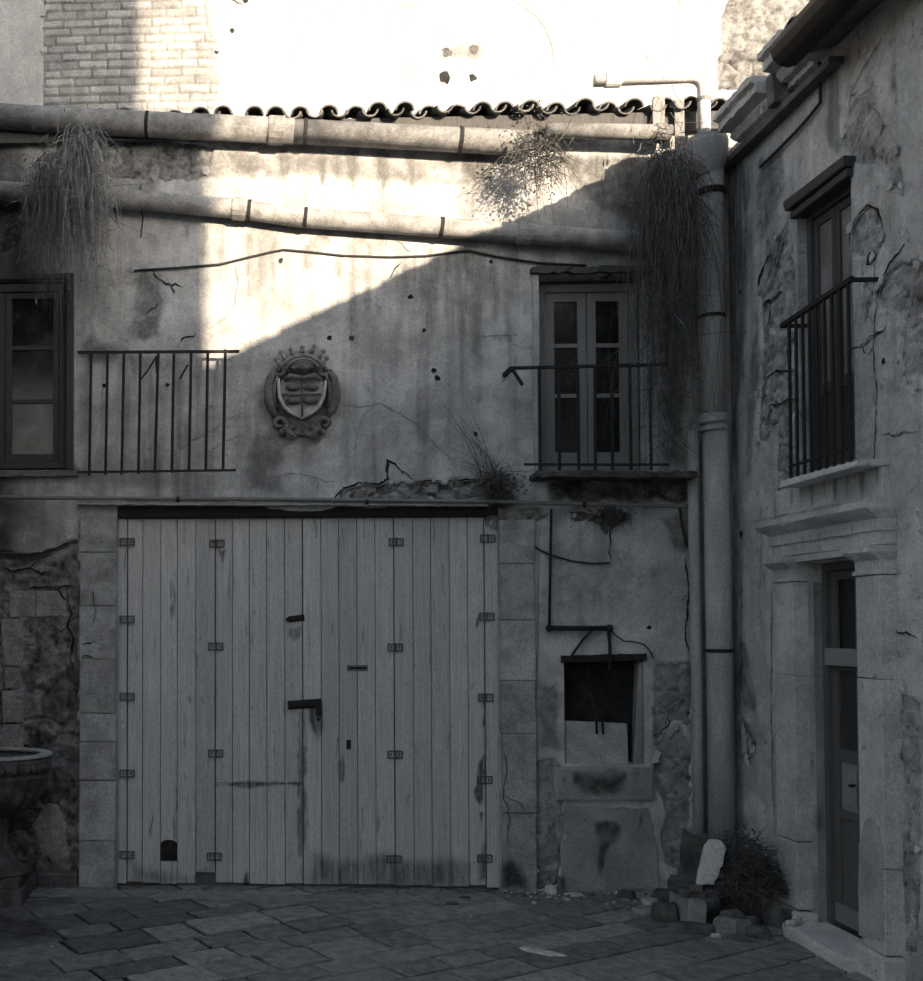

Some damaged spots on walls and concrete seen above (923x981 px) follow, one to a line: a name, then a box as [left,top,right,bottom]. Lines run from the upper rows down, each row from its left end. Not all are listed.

spalling [717,0,810,90]
crack [849,37,883,114]
spalling [102,142,213,182]
crack [849,203,883,246]
damp [133,274,161,339]
spalling [754,228,796,490]
crack [851,243,918,459]
spalling [860,260,923,391]
crack [279,402,479,498]
spalling [0,540,81,885]
damp [574,774,624,793]
spalling [651,662,692,869]